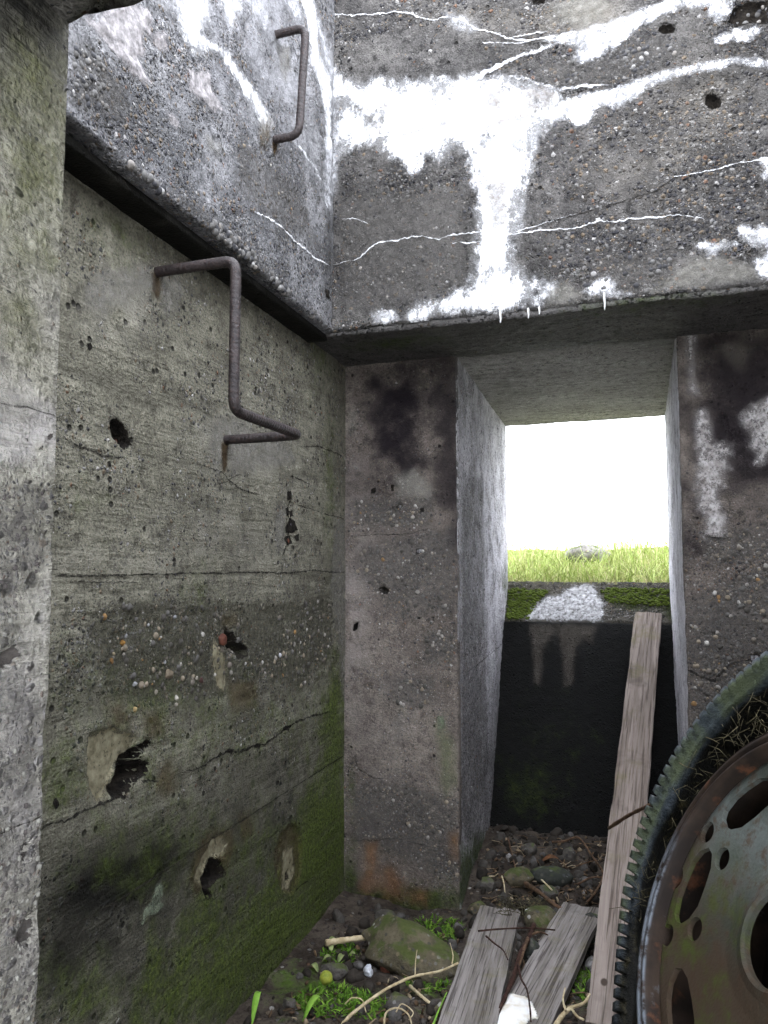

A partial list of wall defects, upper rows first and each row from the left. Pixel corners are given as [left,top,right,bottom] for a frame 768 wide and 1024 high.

crack [335,11,575,83]
damp [715,27,759,44]
damp [289,0,730,322]
crack [255,146,768,265]
corrosion [152,273,161,299]
damp [734,227,768,277]
spalling [109,418,132,450]
damp [697,411,729,536]
spalling [91,600,333,707]
spalling [86,727,159,802]
crack [183,711,328,773]
spalling [194,834,226,900]